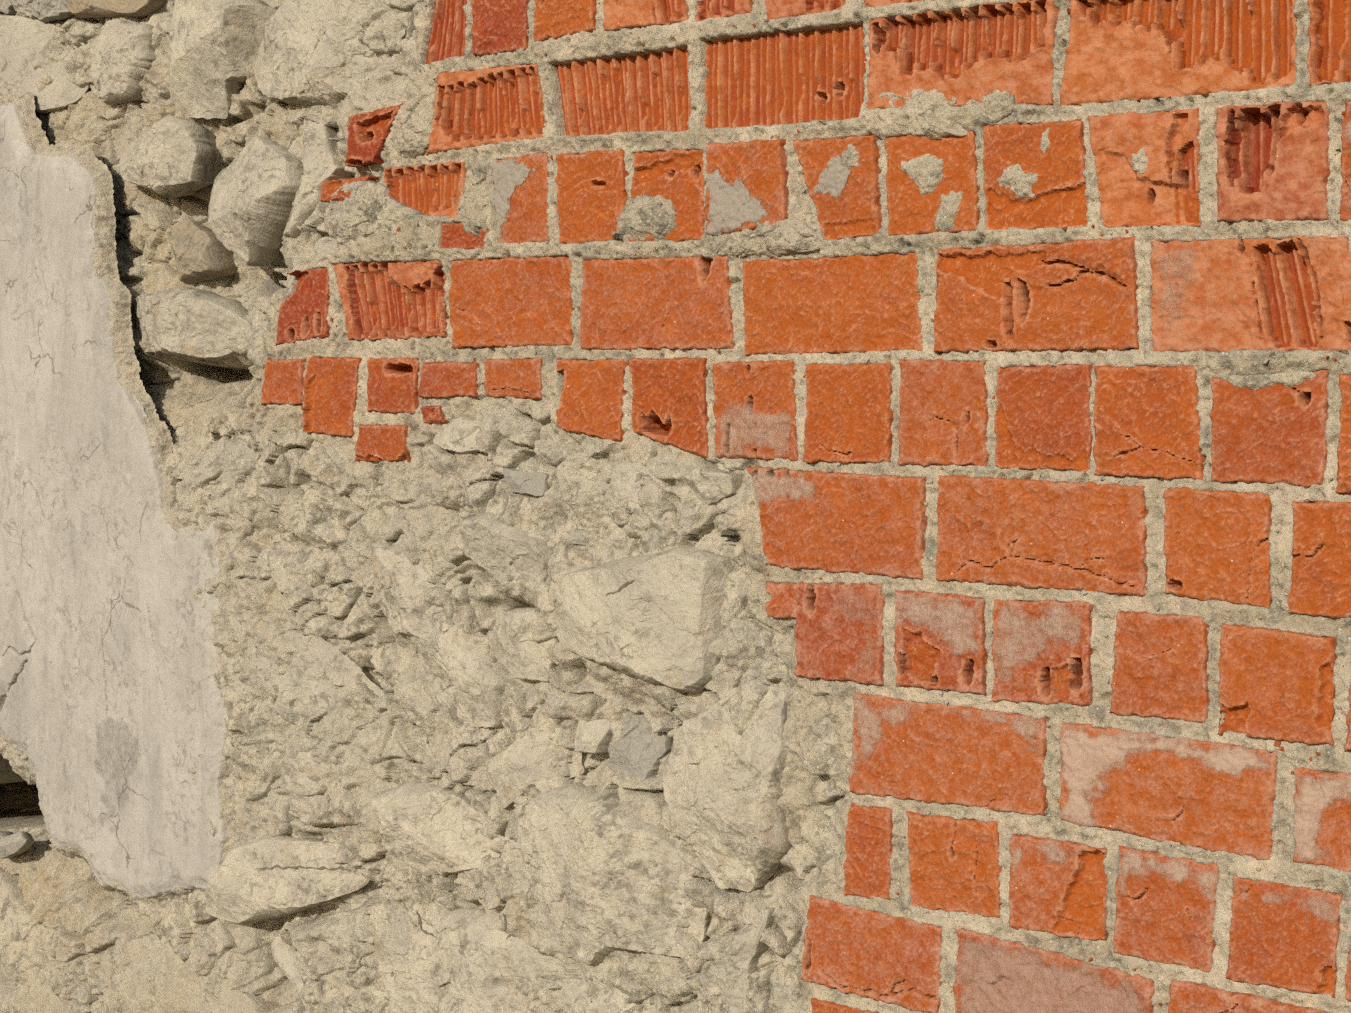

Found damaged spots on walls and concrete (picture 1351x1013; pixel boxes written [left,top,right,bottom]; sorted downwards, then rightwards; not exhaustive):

spalling [320,0,547,218]
spalling [558,0,1351,472]
spalling [275,260,450,346]
spalling [302,356,413,462]
spalling [420,406,449,425]
spalling [747,467,1093,706]
spalling [1217,623,1337,746]
flaking render [98,932,282,1013]
spalling [1008,834,1109,941]
spalling [1226,875,1343,998]